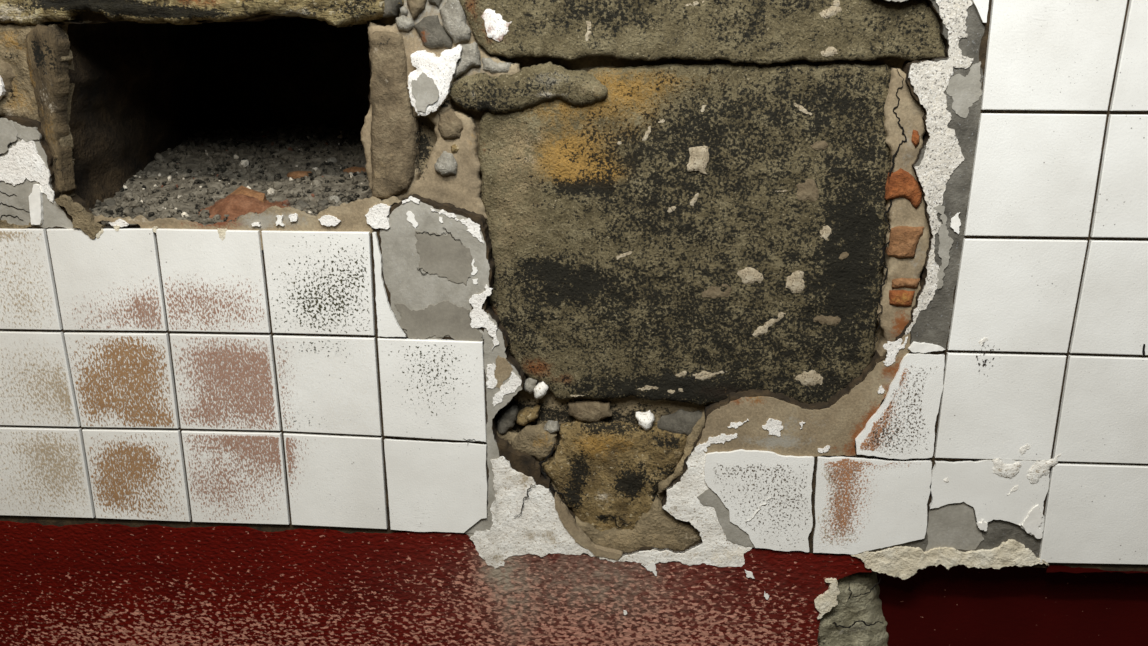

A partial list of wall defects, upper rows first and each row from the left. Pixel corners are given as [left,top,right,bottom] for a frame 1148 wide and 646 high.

flaking render [0,118,129,239]
flaking render [276,213,298,226]
flaking render [318,215,341,226]
flaking render [365,0,1050,646]
rust [70,336,309,521]
rust [824,458,909,543]